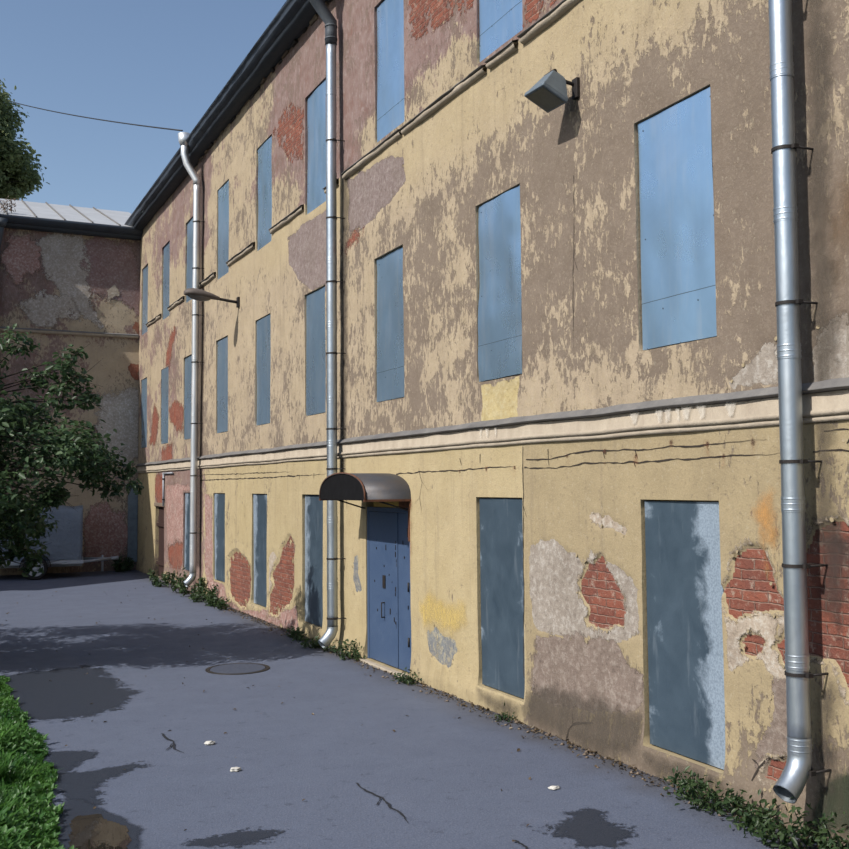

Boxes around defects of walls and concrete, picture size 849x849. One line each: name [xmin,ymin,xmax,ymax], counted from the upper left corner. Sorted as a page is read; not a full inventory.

spalling [406,0,474,44]
spalling [522,0,558,28]
spalling [273,102,304,163]
flaking render [0,233,140,329]
flaking render [727,336,778,389]
flaking render [812,313,849,382]
spalling [204,494,298,630]
crack [396,439,777,673]
flaking render [529,539,644,715]
spalling [721,537,787,792]
spalling [806,515,849,706]
water stain [528,690,639,750]